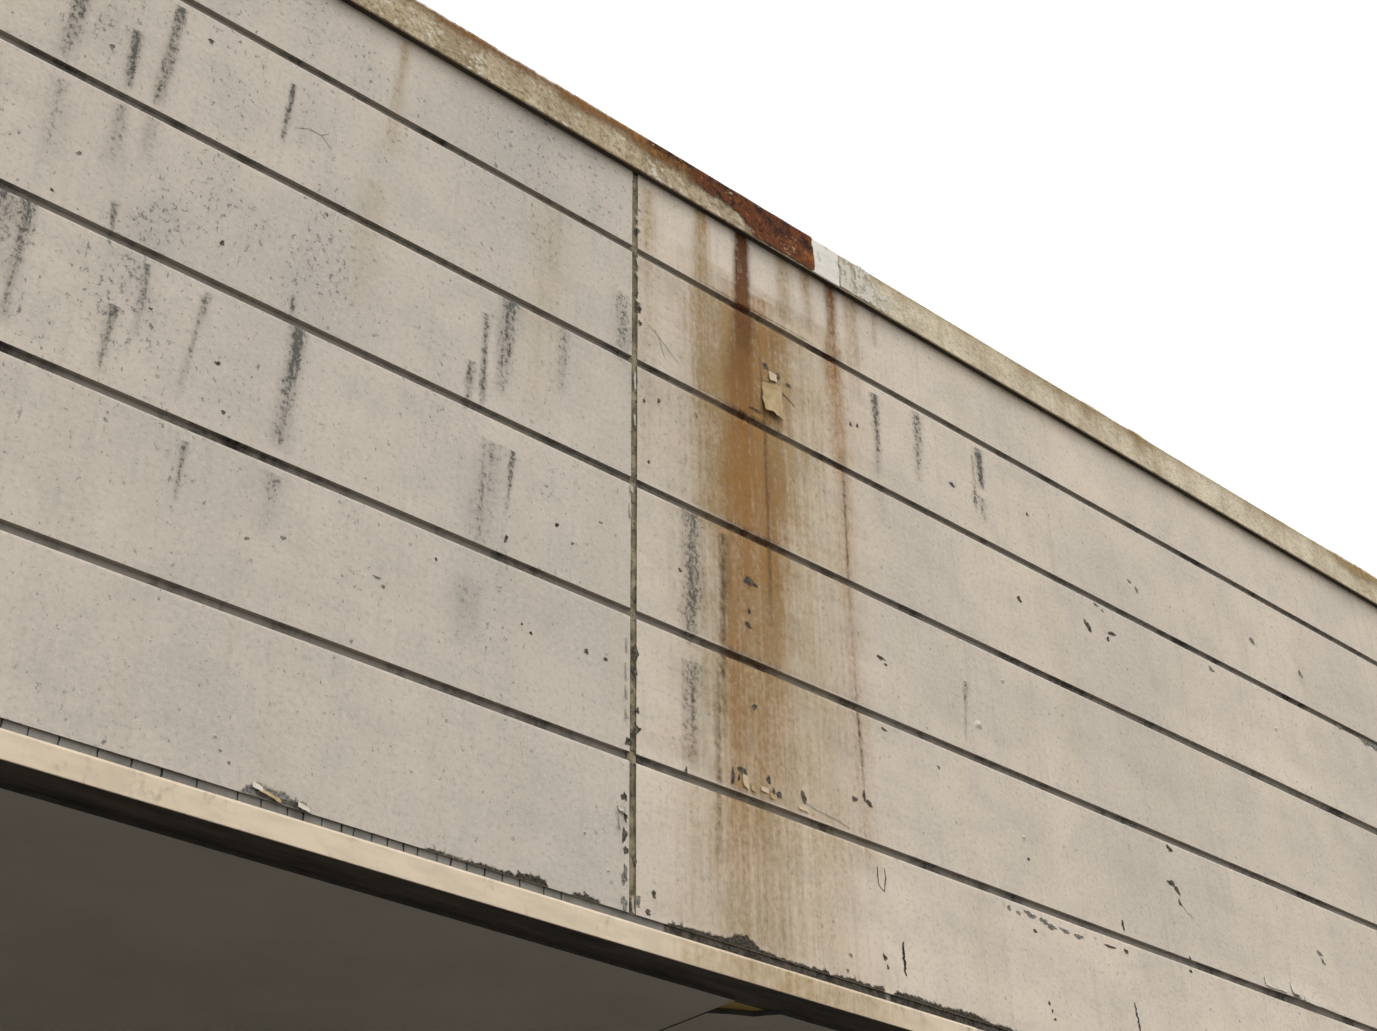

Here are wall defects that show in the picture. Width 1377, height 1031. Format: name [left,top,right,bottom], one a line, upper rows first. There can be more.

leakage [67,0,88,45]
leakage [127,30,141,85]
leakage [155,5,187,98]
leakage [0,179,36,298]
leakage [277,327,306,444]
corrosion [415,0,815,686]
corrosion [825,285,835,335]
peeling [731,767,782,799]
spalling [617,792,1014,1031]
peeling [1007,905,1083,939]